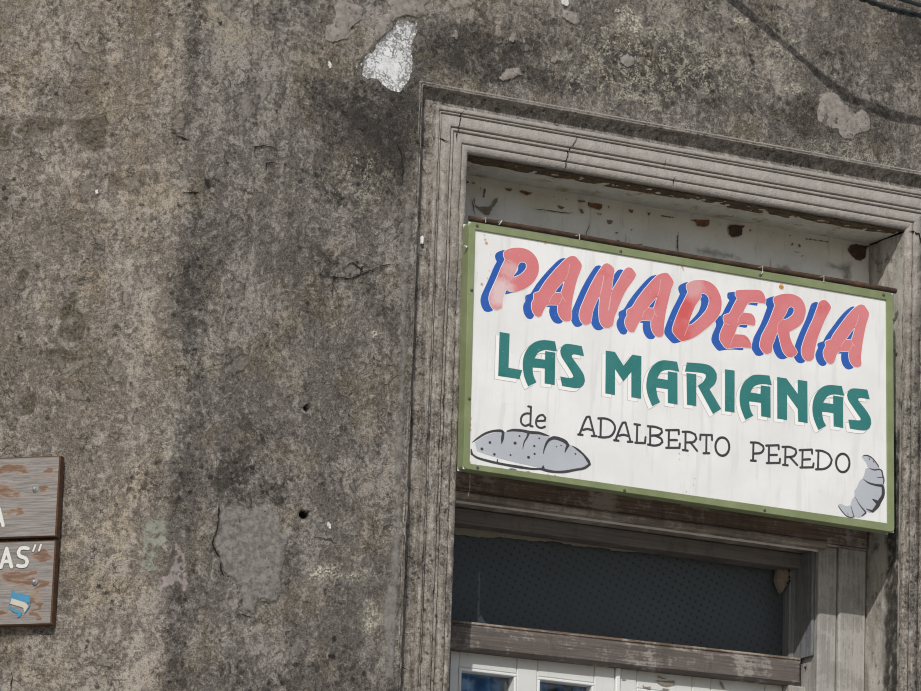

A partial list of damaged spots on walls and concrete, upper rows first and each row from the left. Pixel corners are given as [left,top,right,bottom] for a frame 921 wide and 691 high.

peeling [325,0,363,42]
peeling [356,0,430,92]
peeling [817,92,871,140]
spalling [467,156,904,234]
spalling [728,225,744,237]
spalling [848,244,869,261]
crack [317,262,391,297]